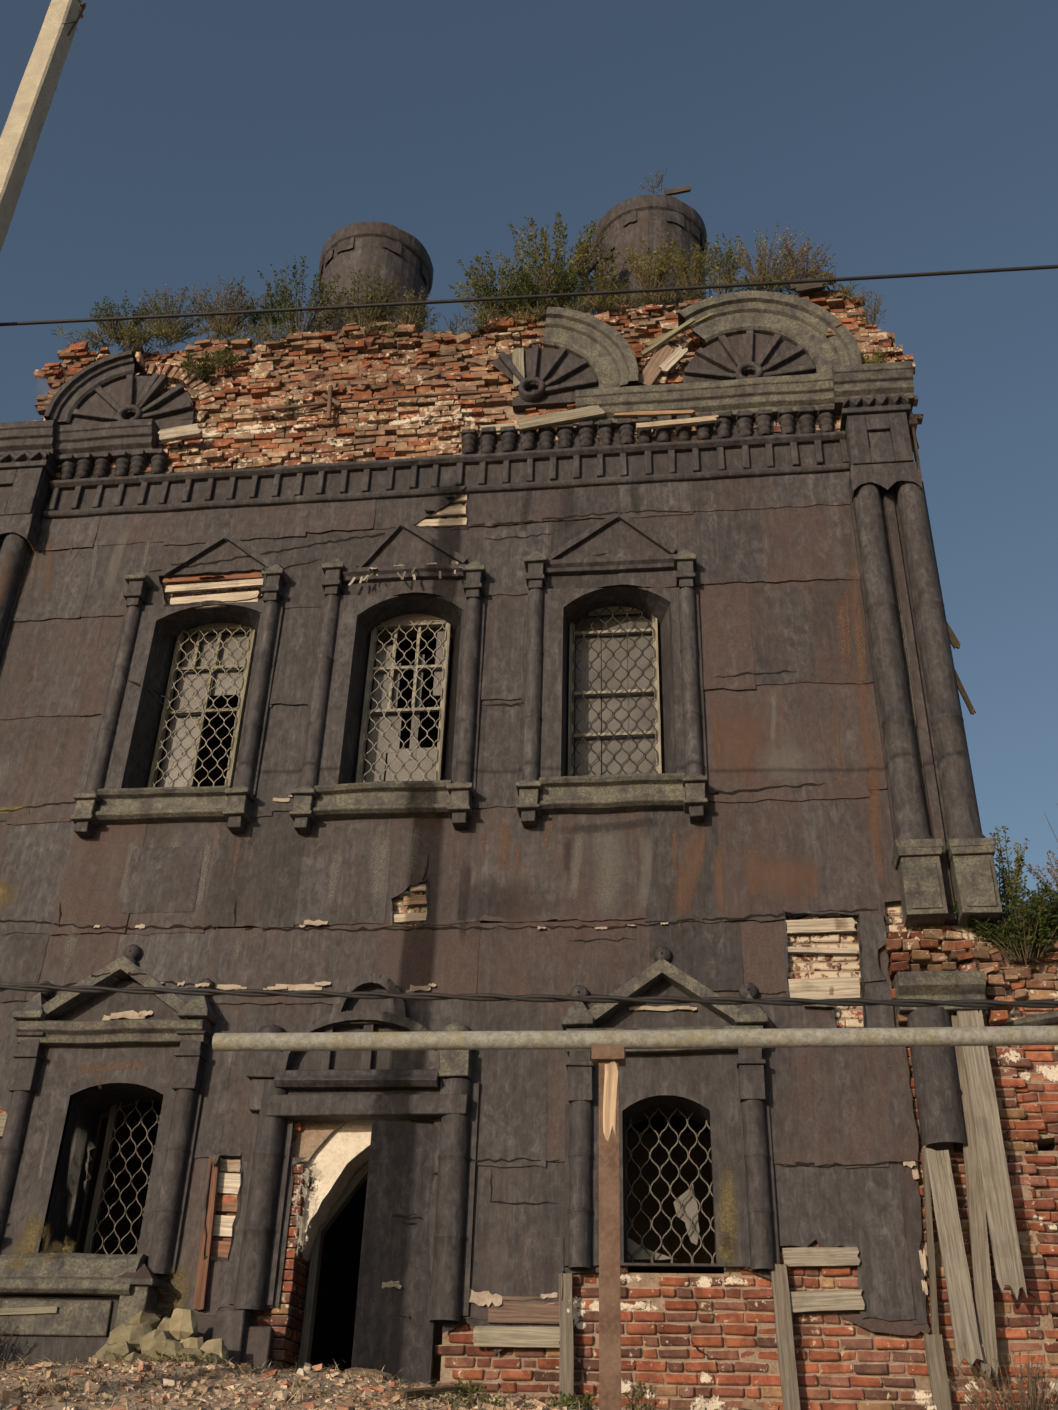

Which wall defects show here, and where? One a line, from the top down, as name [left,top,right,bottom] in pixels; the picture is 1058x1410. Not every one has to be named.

peeling [201,422,373,446]
peeling [390,414,477,426]
peeling [413,486,470,531]
crack [473,505,692,540]
peeling [159,566,268,609]
crack [712,670,795,678]
crack [707,783,824,795]
peeling [389,878,430,929]
crack [0,902,878,942]
peeling [903,1160,920,1179]
peeling [292,1159,323,1254]
peeling [919,1249,928,1295]